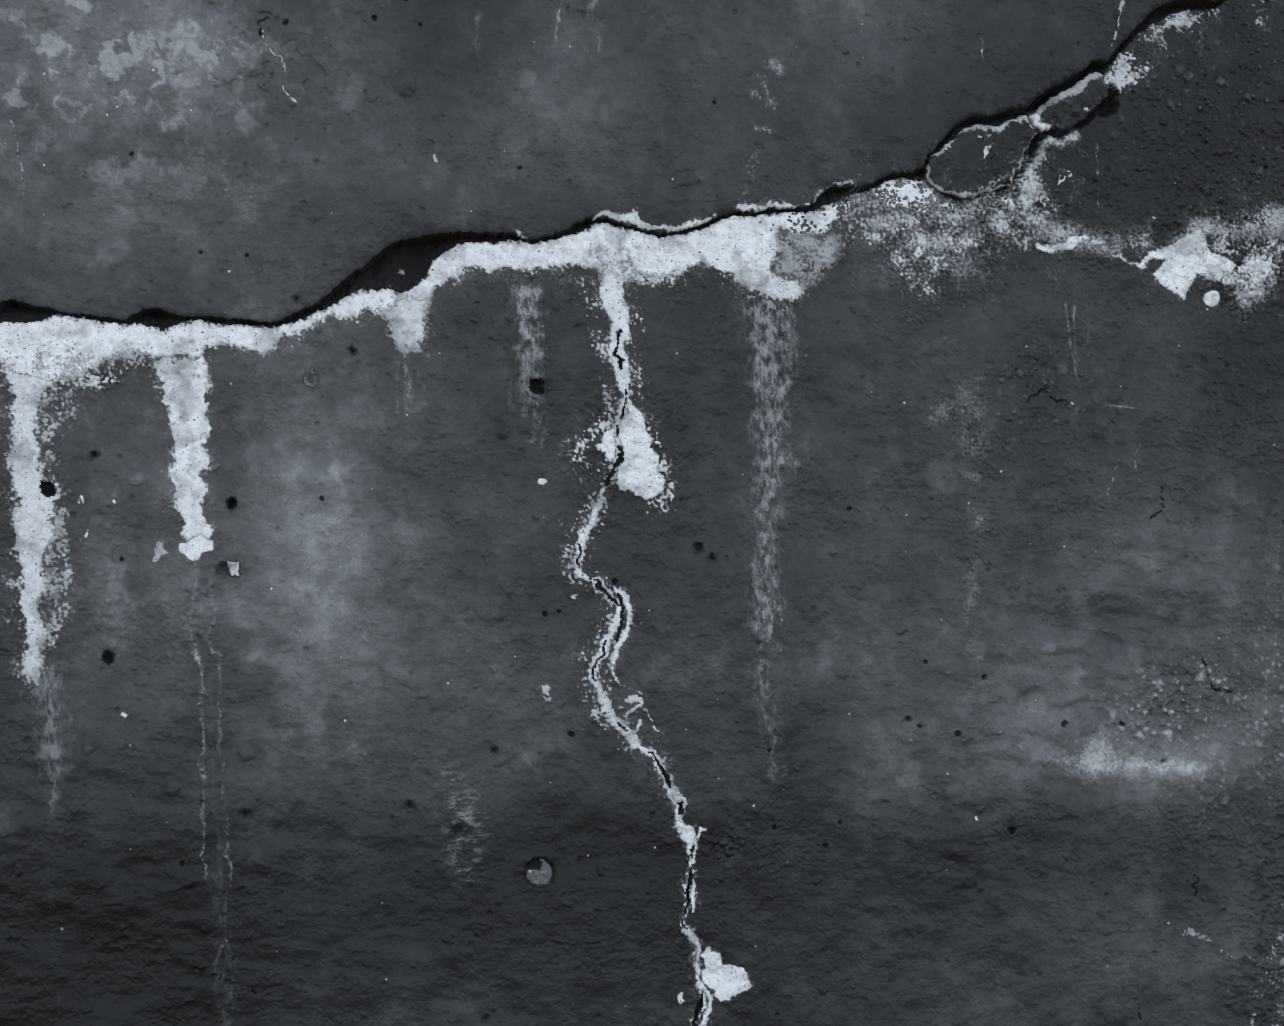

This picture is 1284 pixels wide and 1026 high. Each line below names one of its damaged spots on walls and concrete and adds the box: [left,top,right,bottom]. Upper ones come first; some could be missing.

leakage [0,132,1078,808]
crack [0,0,1225,332]
crack [561,259,713,1026]